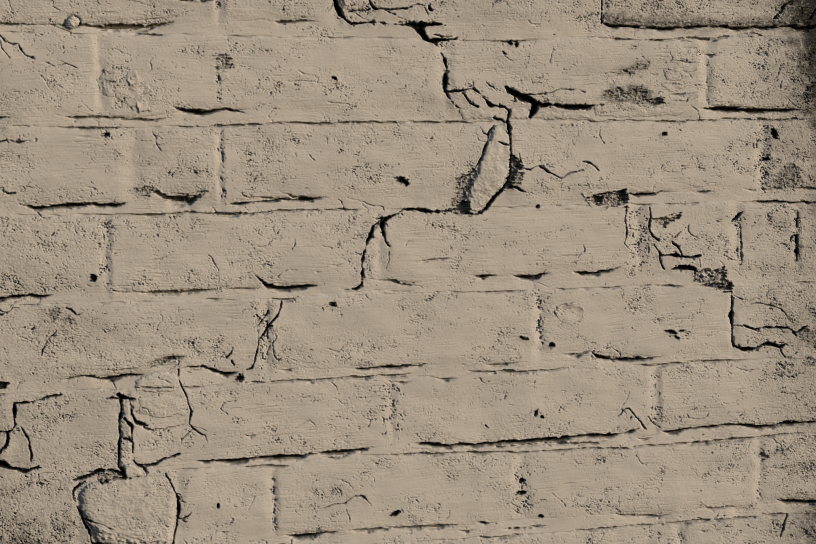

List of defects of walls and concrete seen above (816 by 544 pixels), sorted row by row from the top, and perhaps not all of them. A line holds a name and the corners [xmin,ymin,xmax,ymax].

crack [333,0,594,290]
crack [648,214,700,272]
crack [226,301,282,370]
crack [728,297,805,356]
crack [0,394,62,473]
crack [72,383,187,544]